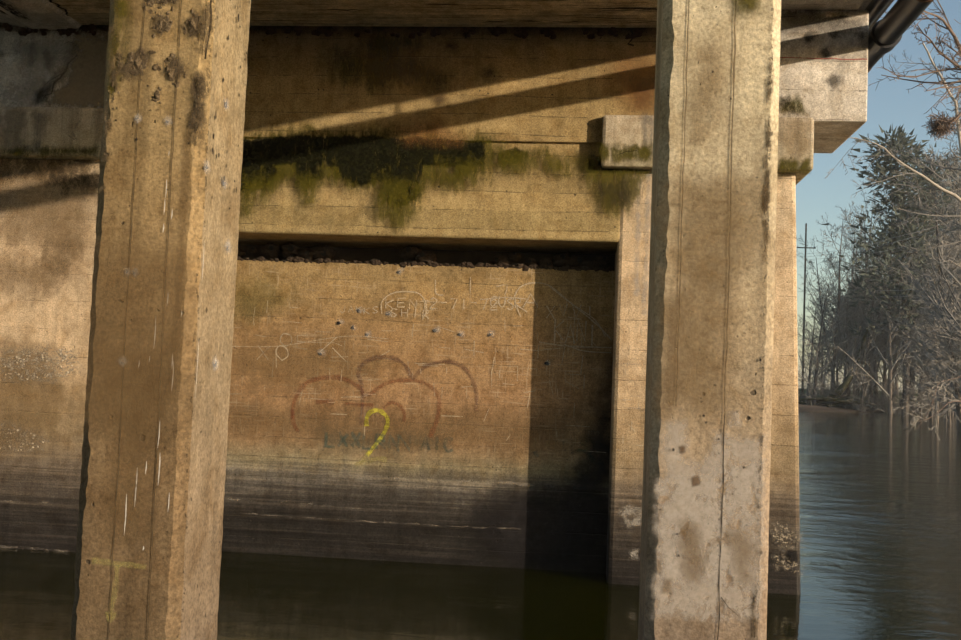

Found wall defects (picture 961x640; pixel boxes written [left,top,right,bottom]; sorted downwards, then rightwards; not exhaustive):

water stain [339,153,423,206]
water stain [600,145,651,163]
water stain [780,159,810,173]
crack [717,0,737,640]
water stain [470,361,613,573]